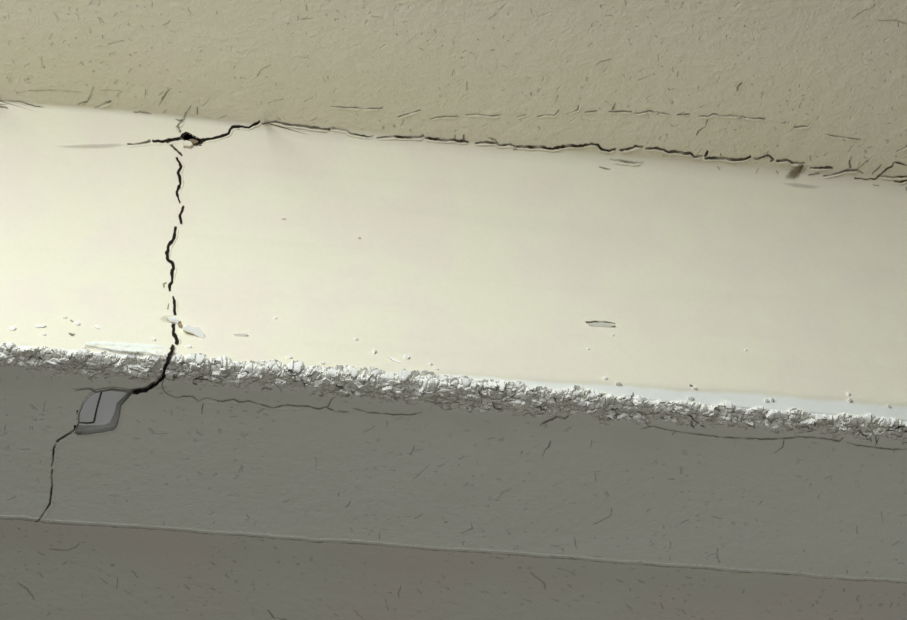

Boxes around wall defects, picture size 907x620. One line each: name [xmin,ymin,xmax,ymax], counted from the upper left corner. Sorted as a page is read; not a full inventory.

crack [127,106,907,413]
flaking render [0,341,907,447]
crack [0,428,907,581]